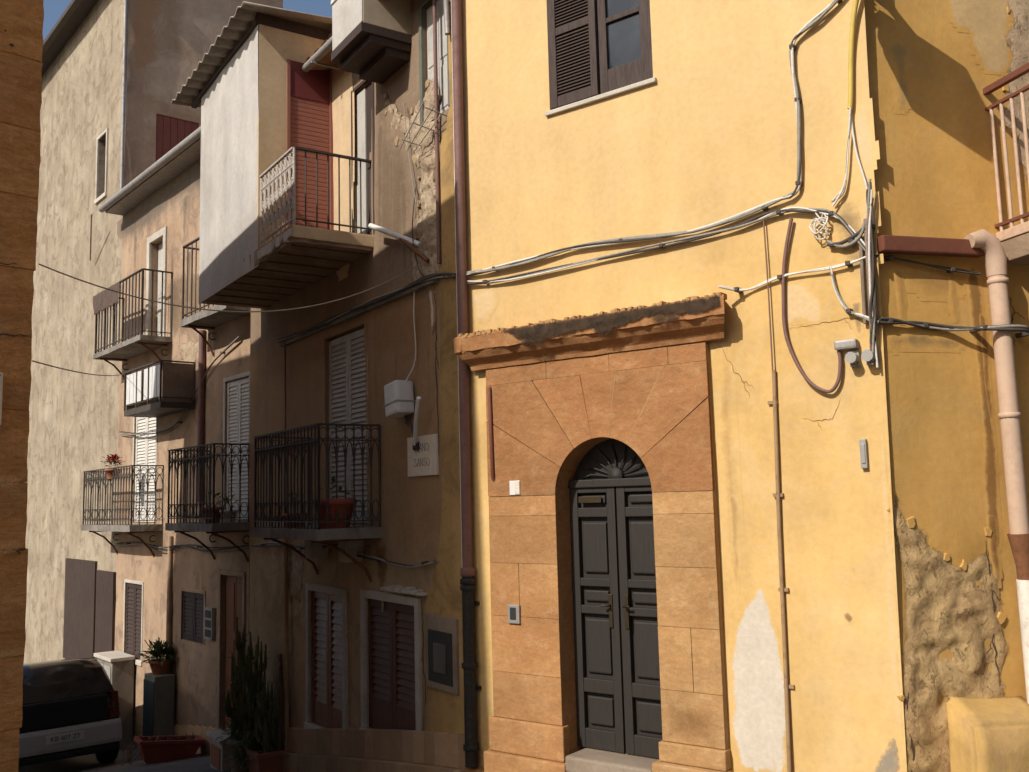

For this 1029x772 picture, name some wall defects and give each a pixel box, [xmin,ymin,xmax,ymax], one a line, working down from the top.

flaking render [947,0,1029,179]
spalling [876,496,1008,772]